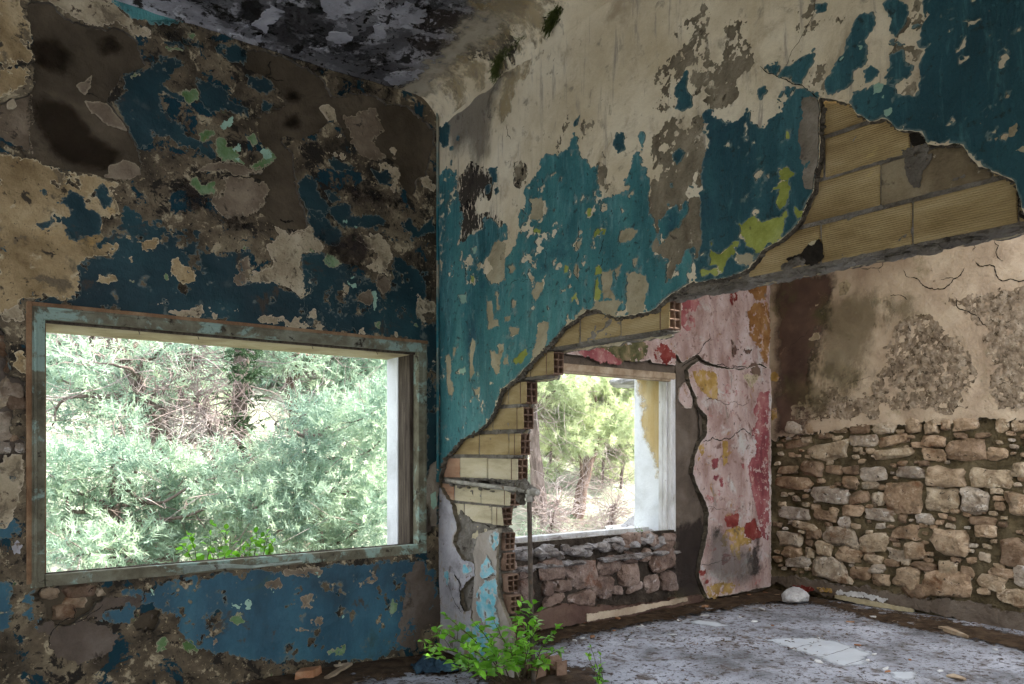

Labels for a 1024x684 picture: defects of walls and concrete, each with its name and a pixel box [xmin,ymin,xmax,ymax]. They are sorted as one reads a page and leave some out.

peeling [0,0,249,322]
peeling [49,0,1024,527]
crack [862,240,1024,327]
crack [683,338,756,382]
flaking render [532,343,707,612]
peeling [0,559,450,665]
peeling [462,555,500,664]
peeling [489,531,499,551]
flaking render [513,539,529,632]